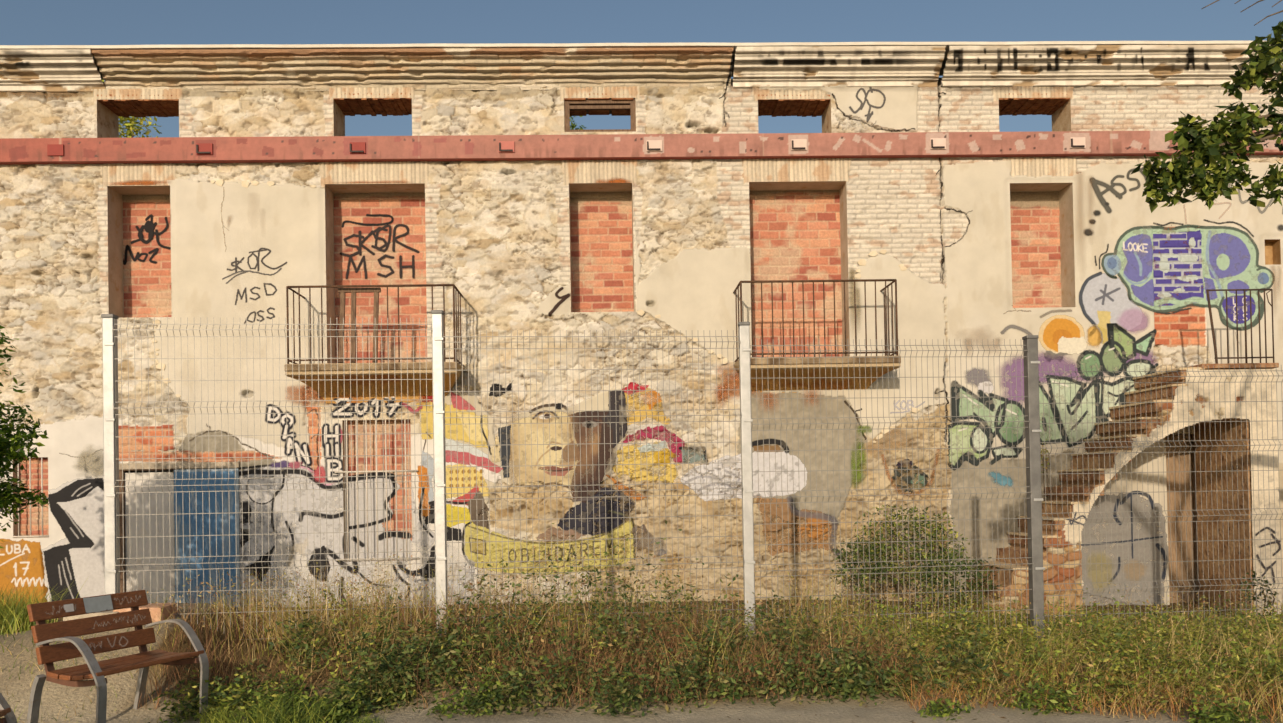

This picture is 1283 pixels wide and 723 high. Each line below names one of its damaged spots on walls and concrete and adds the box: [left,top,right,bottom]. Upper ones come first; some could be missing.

crack [832,84,971,282]
peeling [1216,155,1283,163]
peeling [0,156,1193,604]
peeling [1152,344,1213,371]